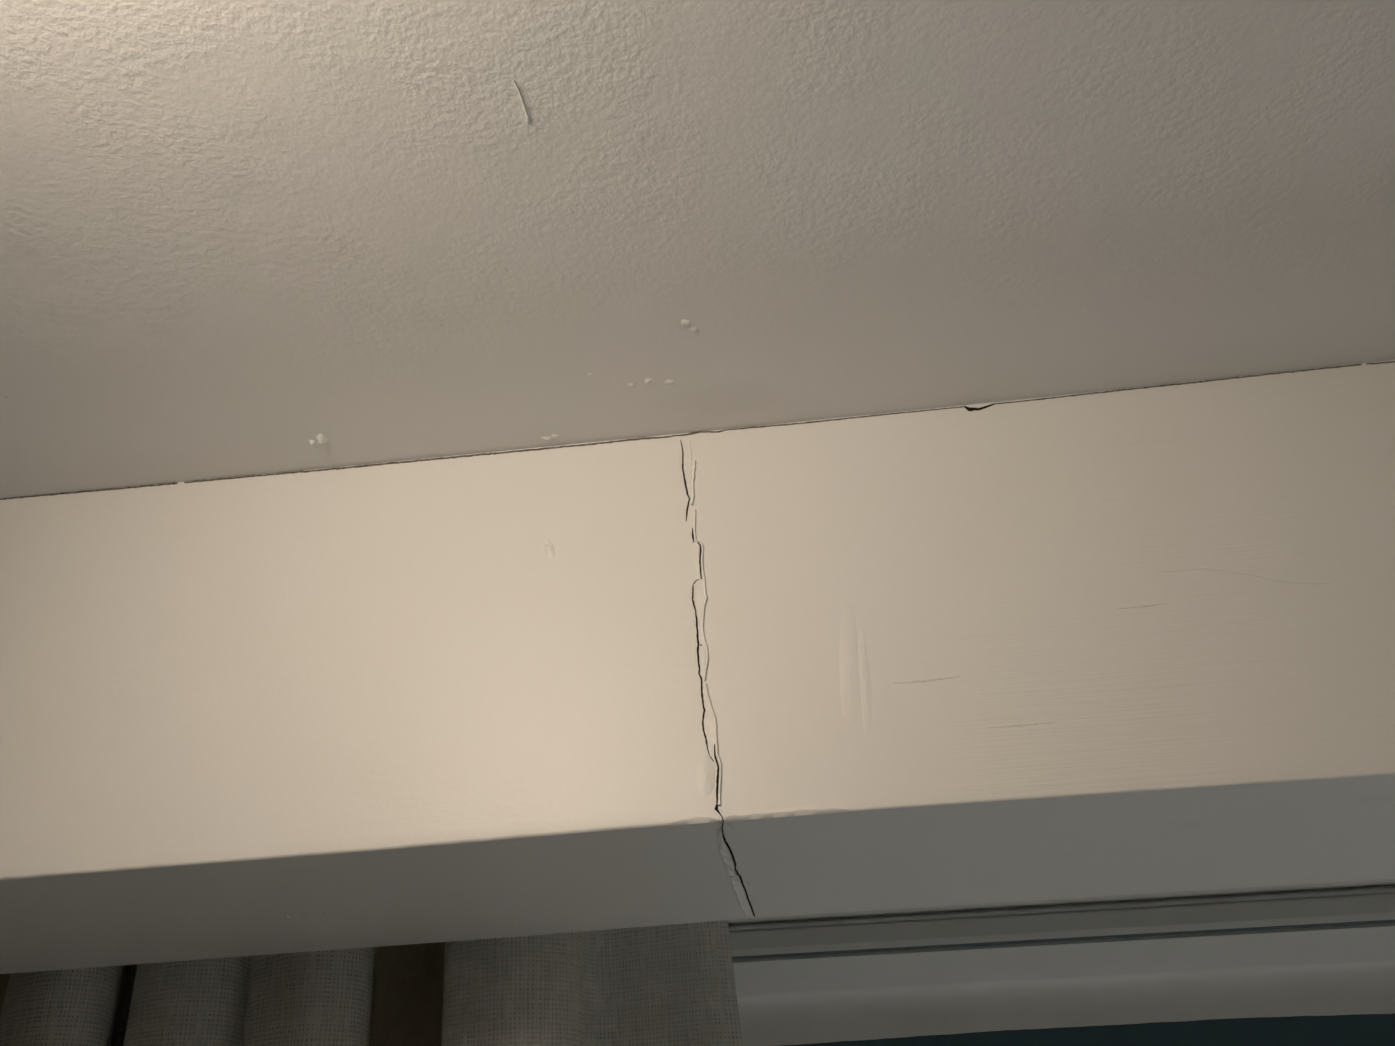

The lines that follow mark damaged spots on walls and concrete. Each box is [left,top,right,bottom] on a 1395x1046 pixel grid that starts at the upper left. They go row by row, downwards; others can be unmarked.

crack [0,361,1395,918]